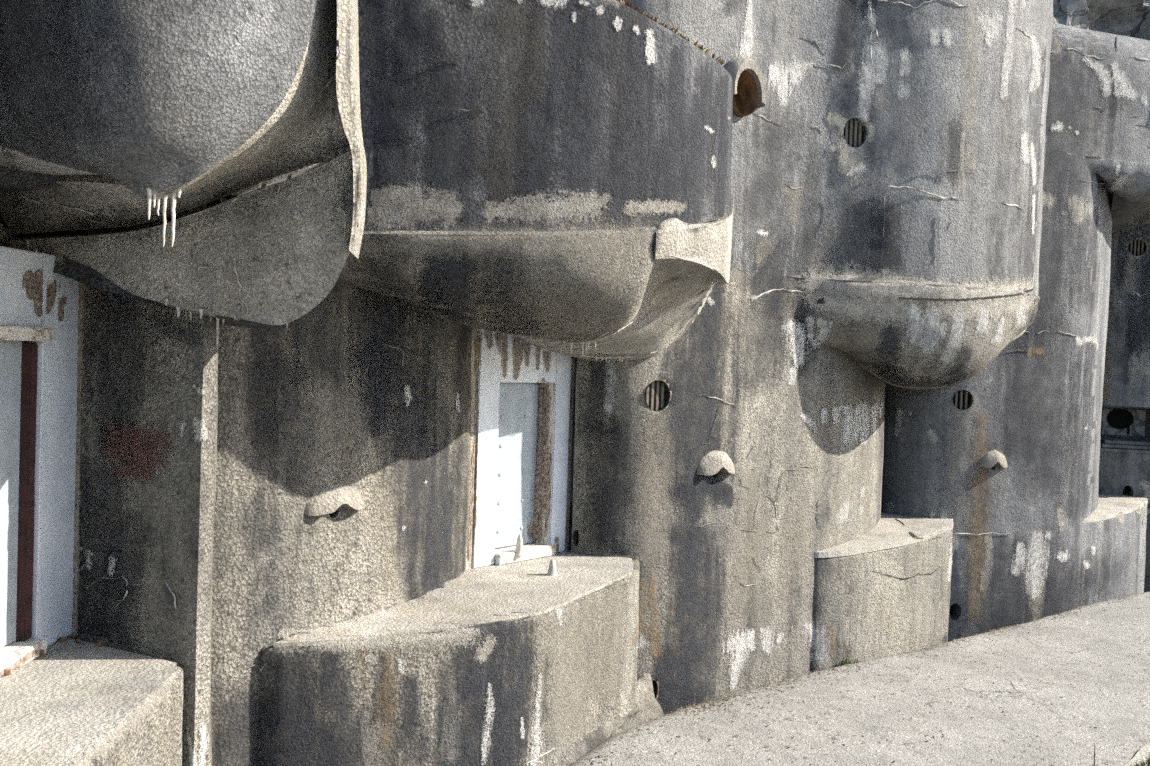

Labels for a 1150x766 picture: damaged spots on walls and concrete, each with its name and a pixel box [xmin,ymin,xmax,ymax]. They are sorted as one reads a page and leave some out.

leakage [737,0,758,58]
crack [800,0,968,72]
leakage [353,0,730,252]
leakage [655,283,784,715]
leakage [978,507,1121,630]